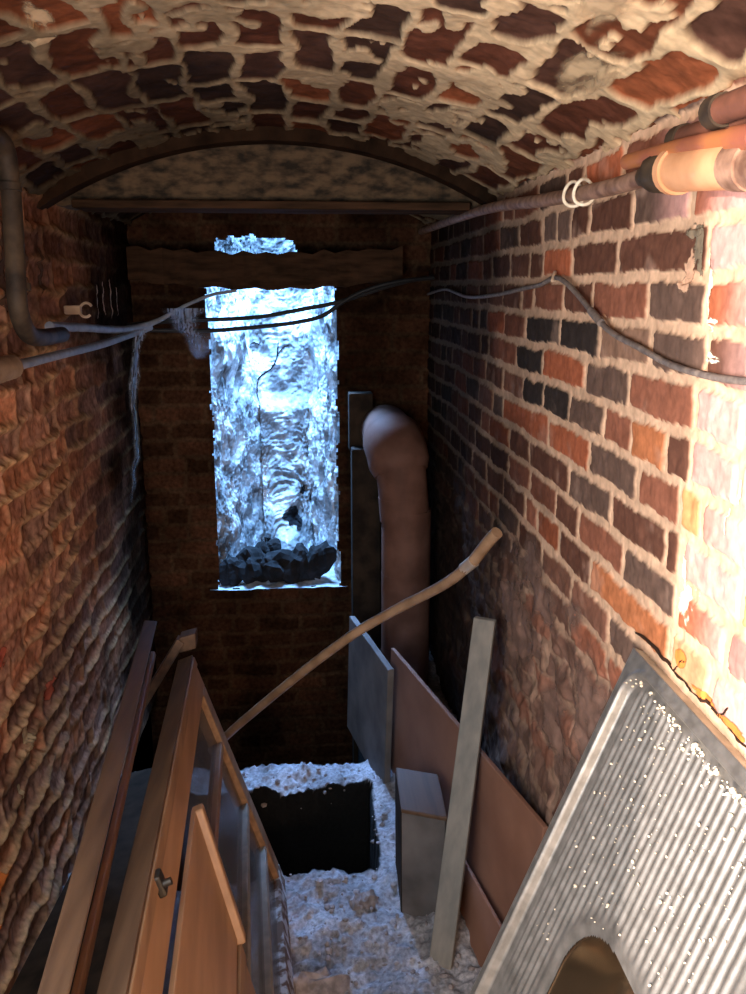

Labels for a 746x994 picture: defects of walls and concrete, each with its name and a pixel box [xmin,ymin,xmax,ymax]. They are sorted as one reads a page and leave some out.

peeling [23,7,57,48]
peeling [582,0,625,23]
peeling [560,53,615,93]
crack [635,632,746,748]